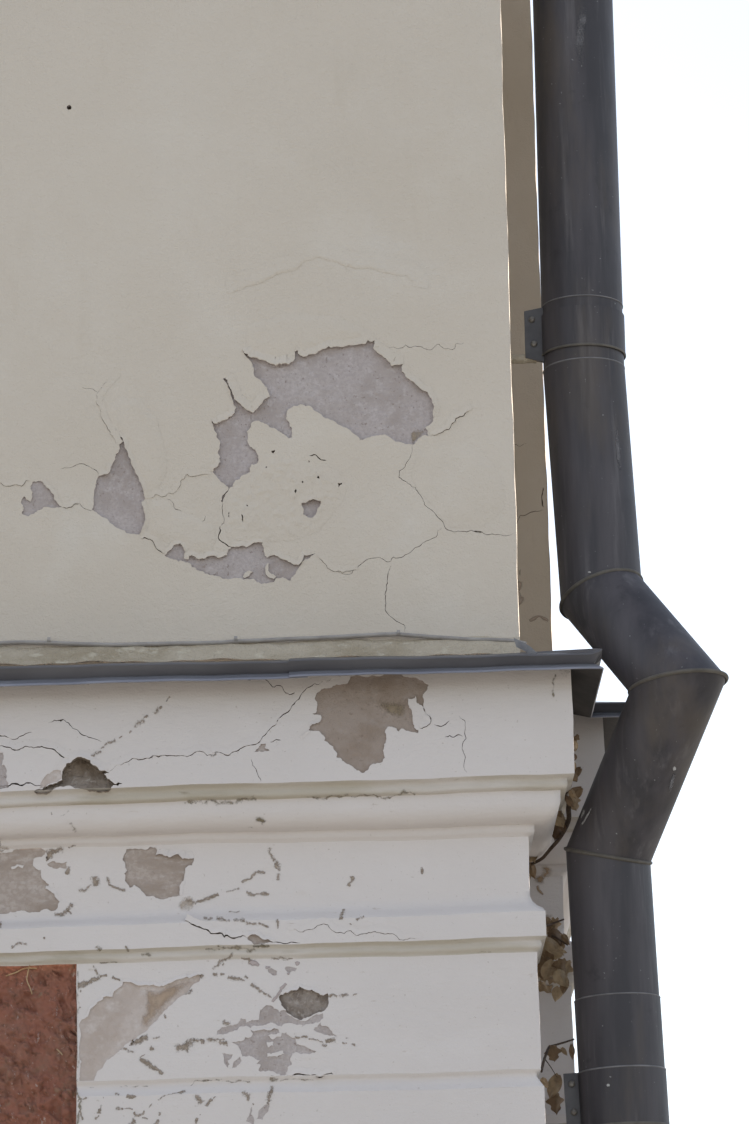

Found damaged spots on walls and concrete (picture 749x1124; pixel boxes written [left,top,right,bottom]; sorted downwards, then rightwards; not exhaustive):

peeling [164,331,440,584]
crack [341,404,544,632]
spalling [35,750,122,795]
crack [0,676,341,780]
peeling [300,674,428,773]
crack [419,714,466,770]
peeling [0,848,67,916]
peeling [123,845,194,899]
crack [185,914,249,939]
crack [277,917,423,944]
peeling [79,971,203,1081]
peeling [217,966,336,1075]